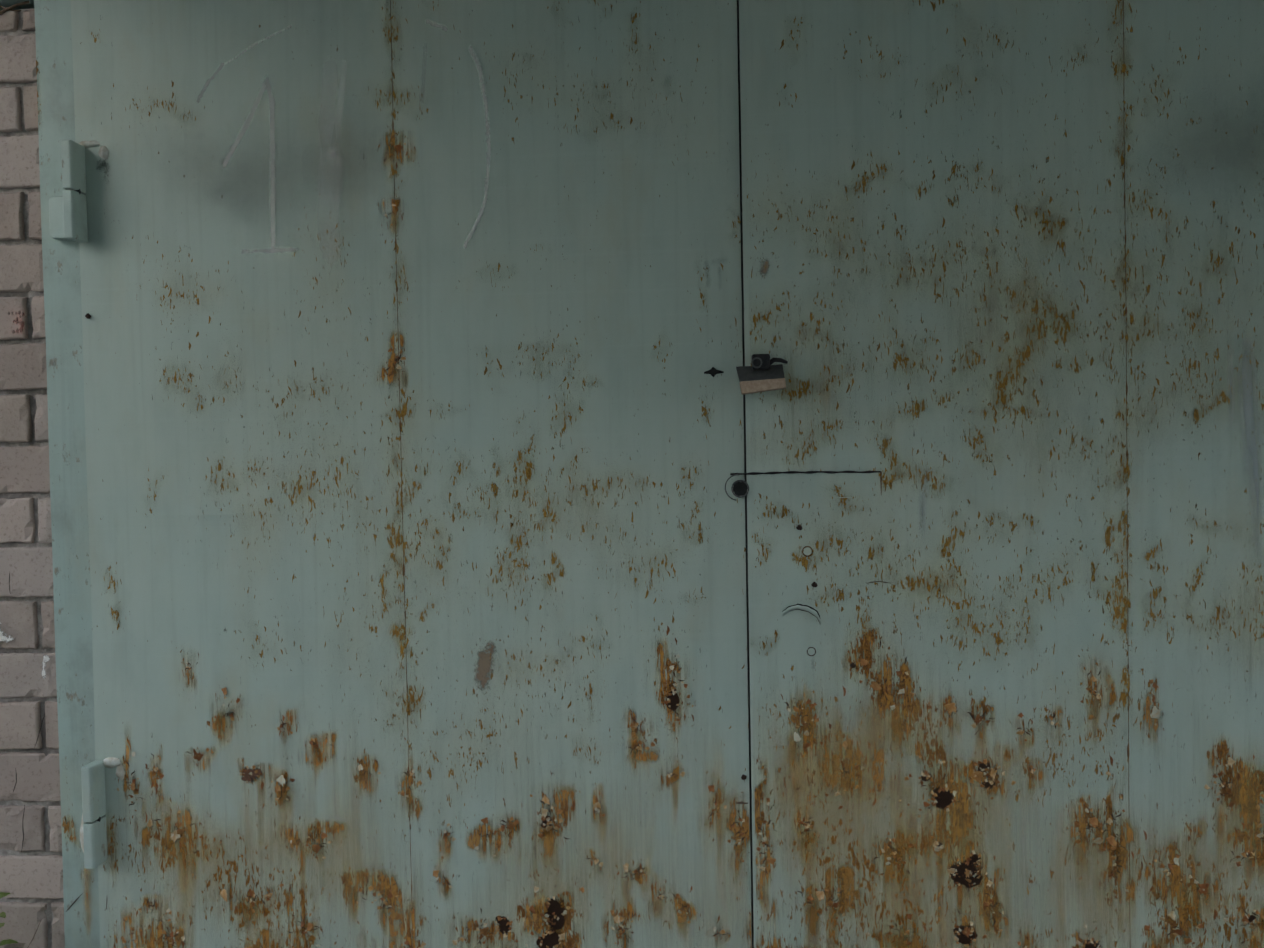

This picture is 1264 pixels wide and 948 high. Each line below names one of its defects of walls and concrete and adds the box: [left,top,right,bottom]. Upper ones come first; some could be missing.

rust [586,0,1264,948]
rust [62,816,81,852]
rust [177,687,242,776]
rust [81,710,426,948]